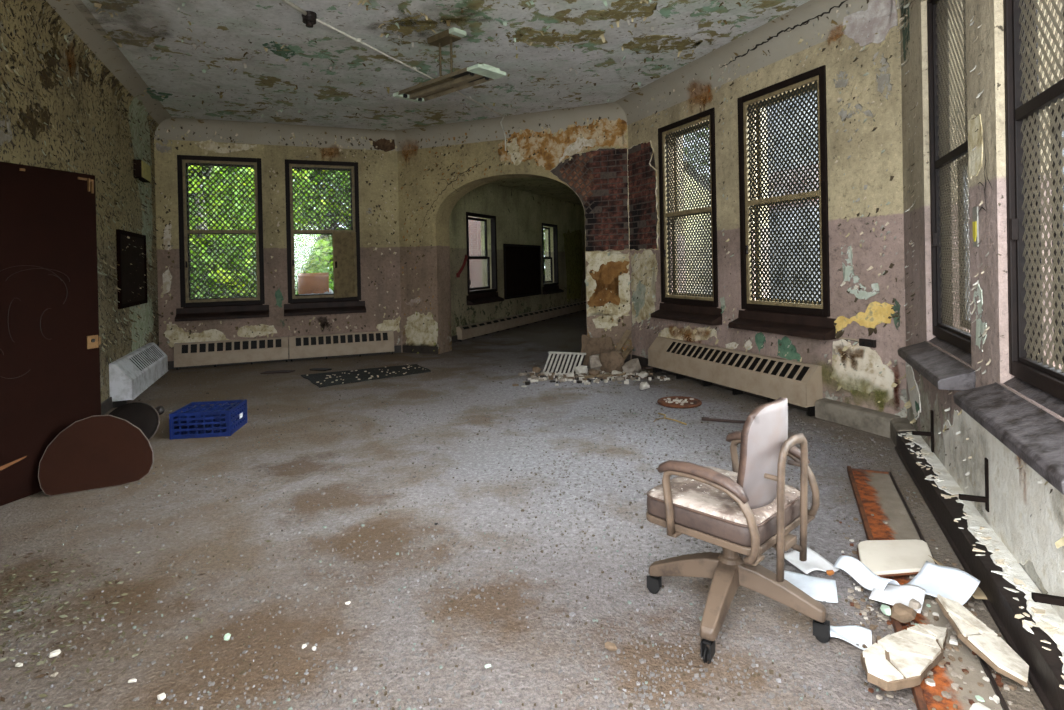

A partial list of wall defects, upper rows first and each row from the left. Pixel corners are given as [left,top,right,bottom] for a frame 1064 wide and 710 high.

peeling [0,0,809,363]
crack [721,0,847,68]
flaking render [824,89,1064,689]